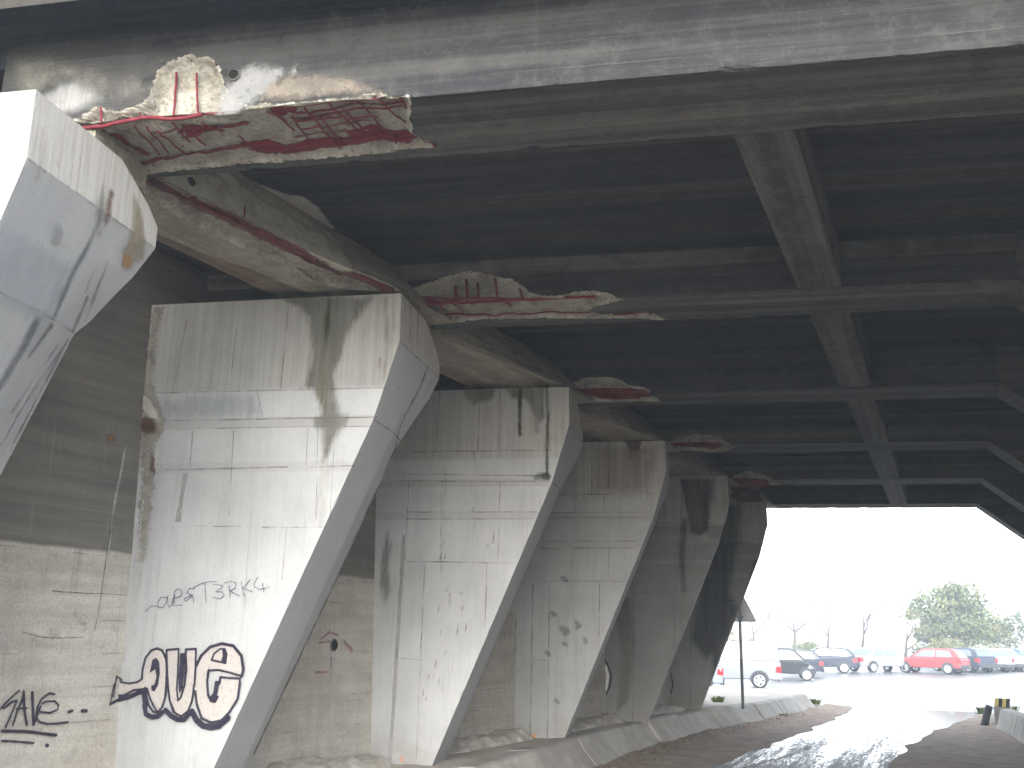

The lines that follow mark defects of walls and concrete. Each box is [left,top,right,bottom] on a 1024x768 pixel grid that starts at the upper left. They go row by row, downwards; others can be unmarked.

efflorescence [216,64,298,118]
damp [98,190,114,223]
rust [123,200,144,269]
spalling [18,53,437,292]
spalling [413,271,666,324]
damp [0,319,52,388]
damp [290,296,366,460]
spalling [573,377,661,403]
damp [511,385,550,480]
spalling [669,434,737,452]